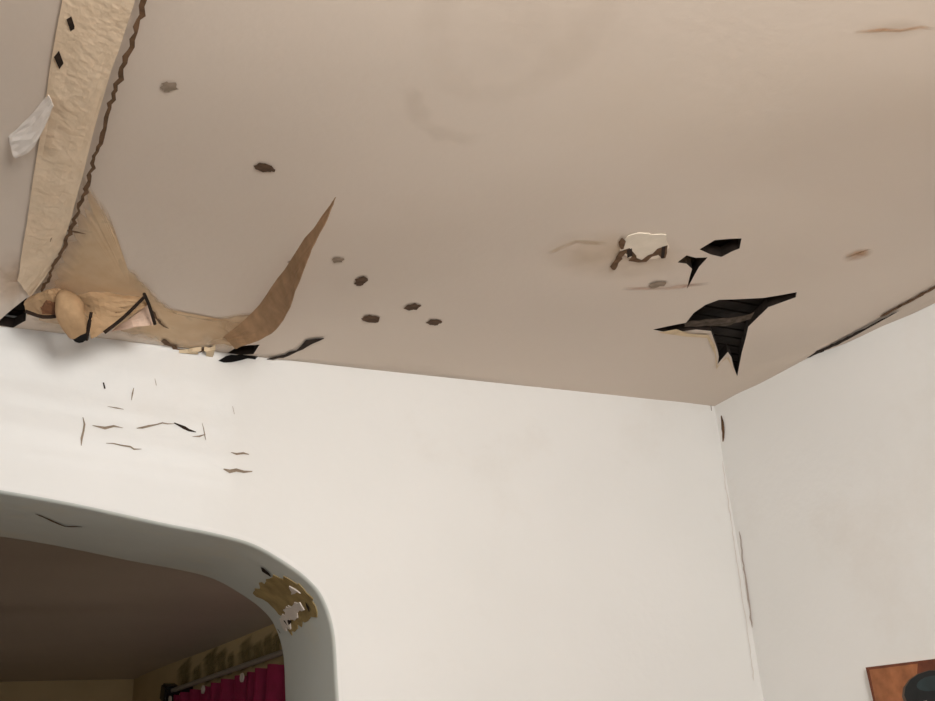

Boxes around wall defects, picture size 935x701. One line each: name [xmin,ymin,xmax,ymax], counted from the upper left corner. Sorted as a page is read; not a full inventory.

spalling [160,82,178,92]
peeling [8,95,53,158]
spalling [254,163,275,172]
peeling [610,232,669,270]
peeling [57,195,249,357]
spalling [361,315,380,323]
peeling [253,574,318,635]